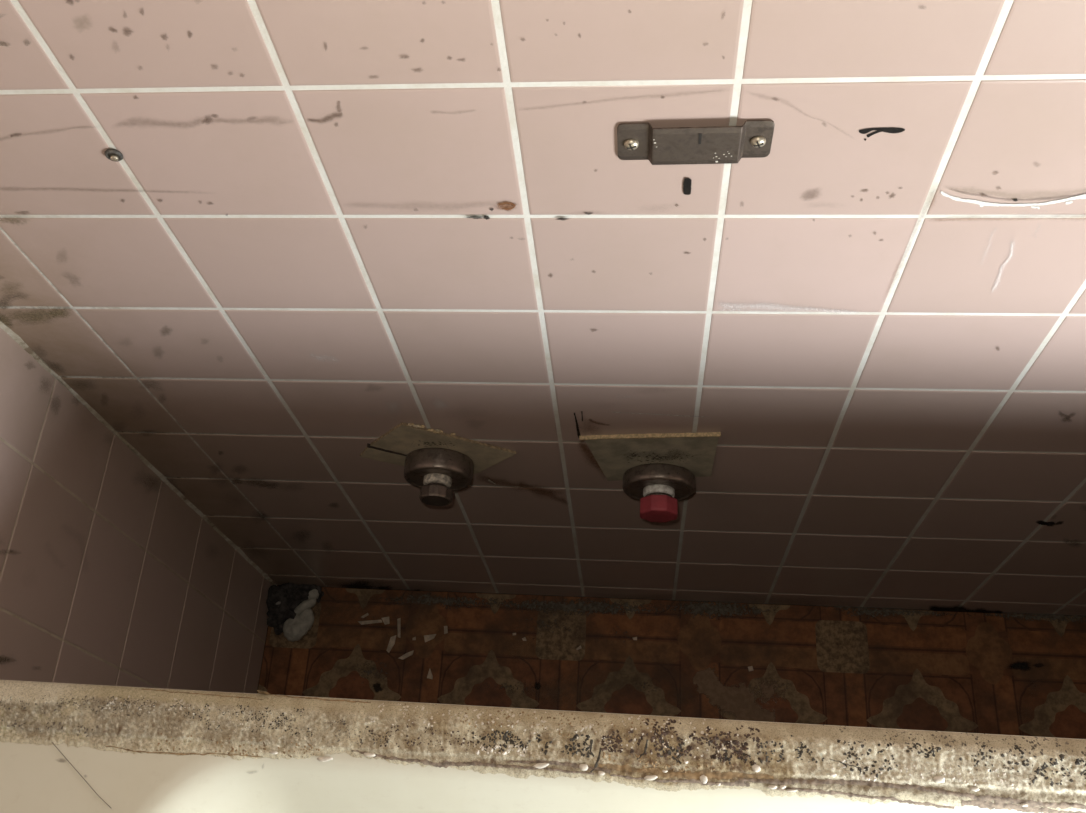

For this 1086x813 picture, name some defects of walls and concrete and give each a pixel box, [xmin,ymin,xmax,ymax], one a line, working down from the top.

leakage [327,668,1086,813]